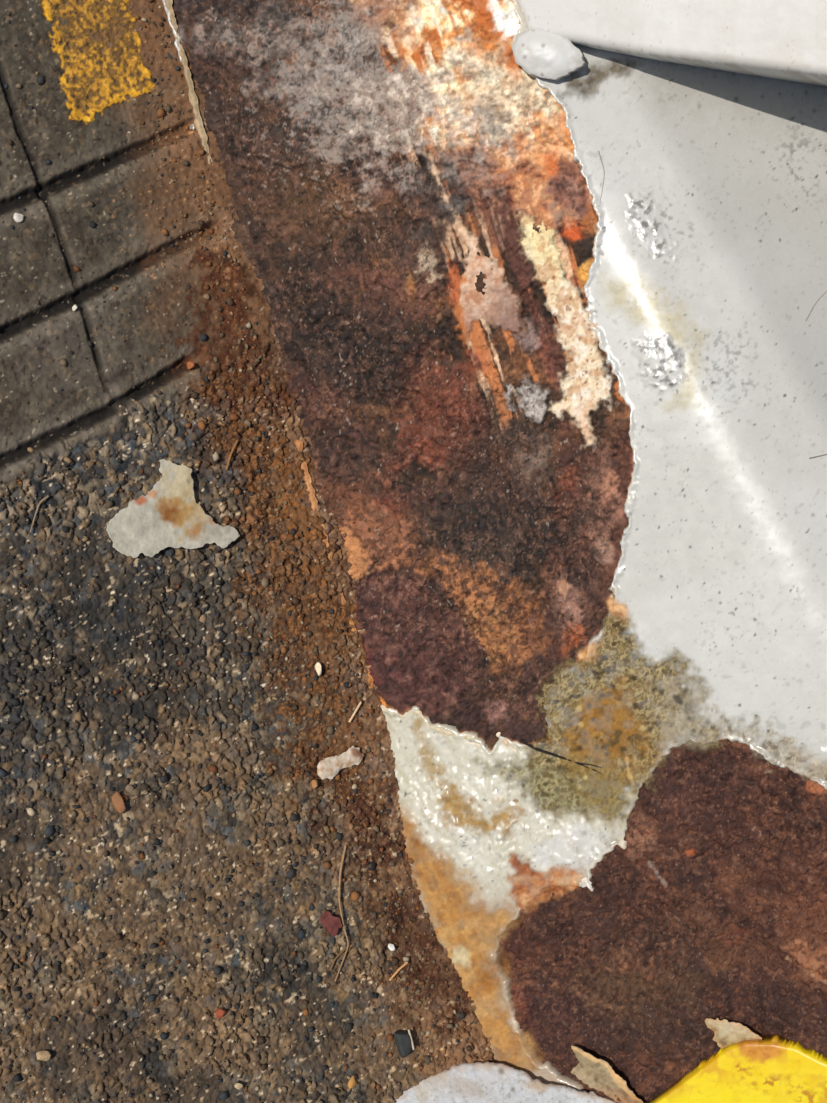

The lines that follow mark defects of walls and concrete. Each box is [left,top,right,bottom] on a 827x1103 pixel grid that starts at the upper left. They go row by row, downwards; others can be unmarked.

rust [165,0,634,793]
damp [713,717,827,780]
rust [291,739,827,1103]
peeling [705,1018,762,1048]
peeling [571,1045,644,1103]